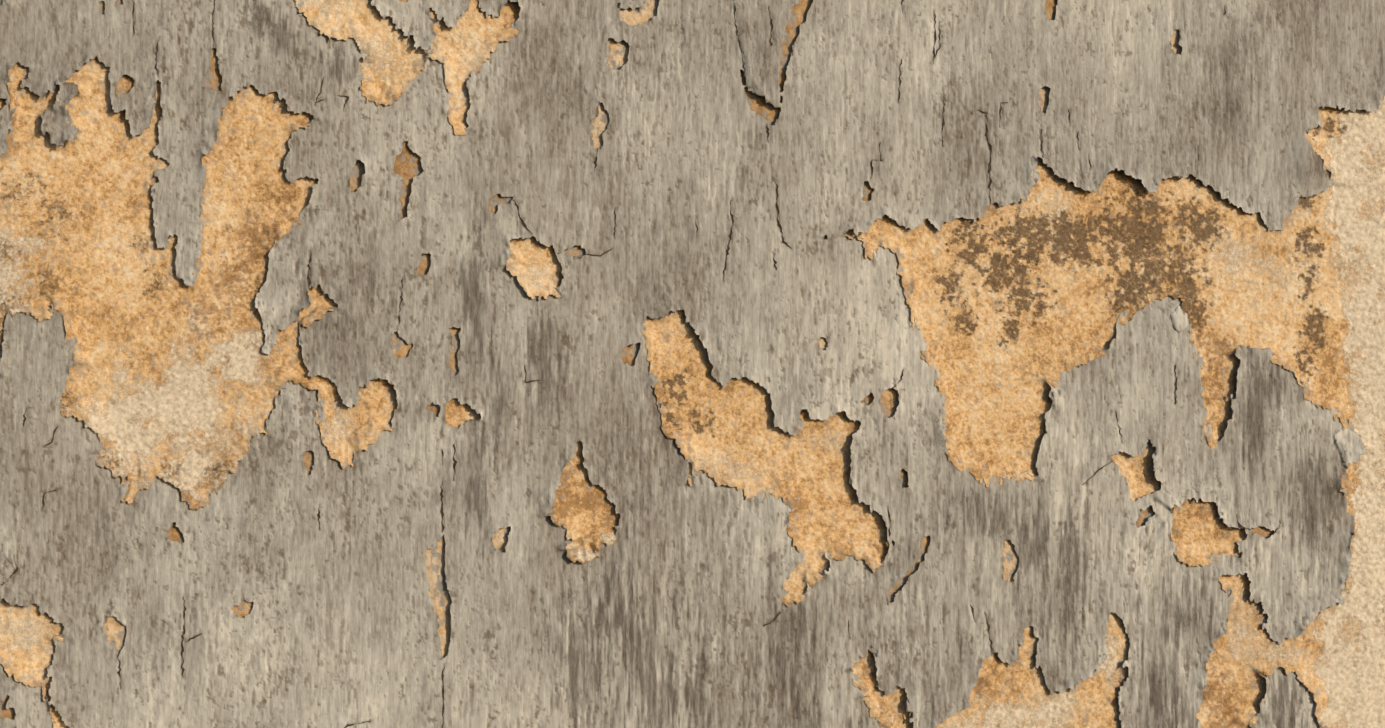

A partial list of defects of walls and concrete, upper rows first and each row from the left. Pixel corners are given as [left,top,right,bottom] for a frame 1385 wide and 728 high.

peeling [295,0,529,135]
peeling [393,141,424,220]
peeling [0,48,407,510]
peeling [416,253,431,277]
peeling [497,232,586,301]
peeling [166,522,185,543]
peeling [447,327,461,376]
peeling [426,397,487,429]
peeling [542,435,628,564]
peeling [621,299,930,607]
peeling [824,86,1385,728]
peeling [0,591,77,728]